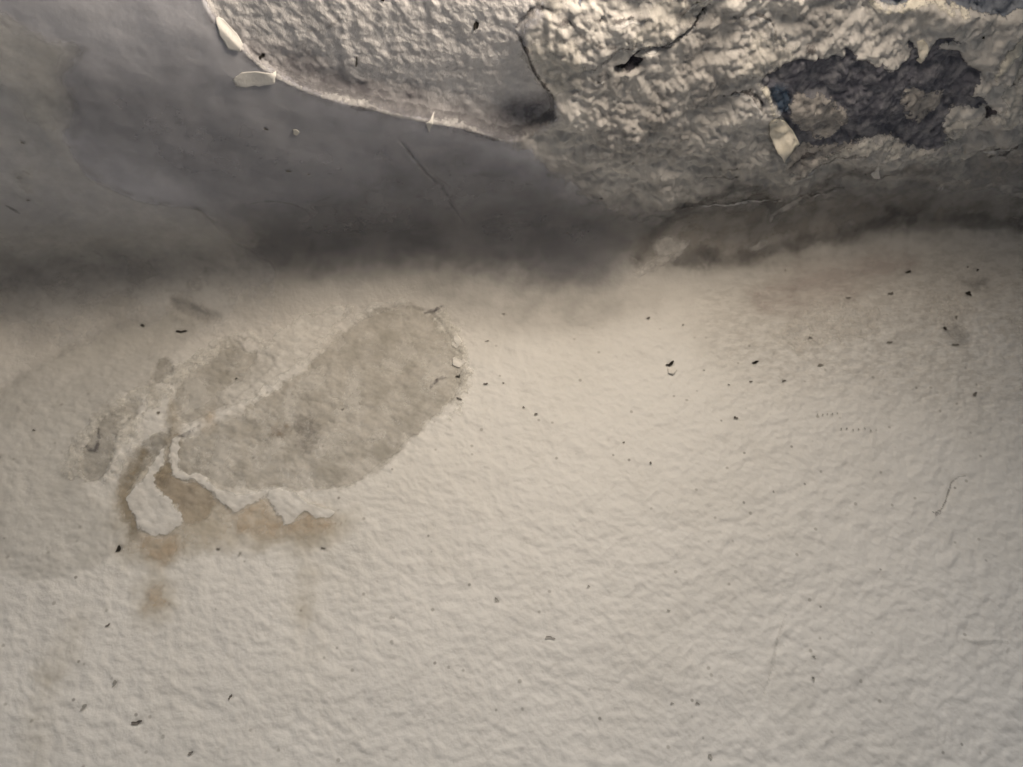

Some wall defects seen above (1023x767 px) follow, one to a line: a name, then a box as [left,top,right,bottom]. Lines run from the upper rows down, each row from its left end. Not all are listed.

leakage [0,28,274,322]
peeling [514,0,1023,222]
leakage [641,196,987,273]